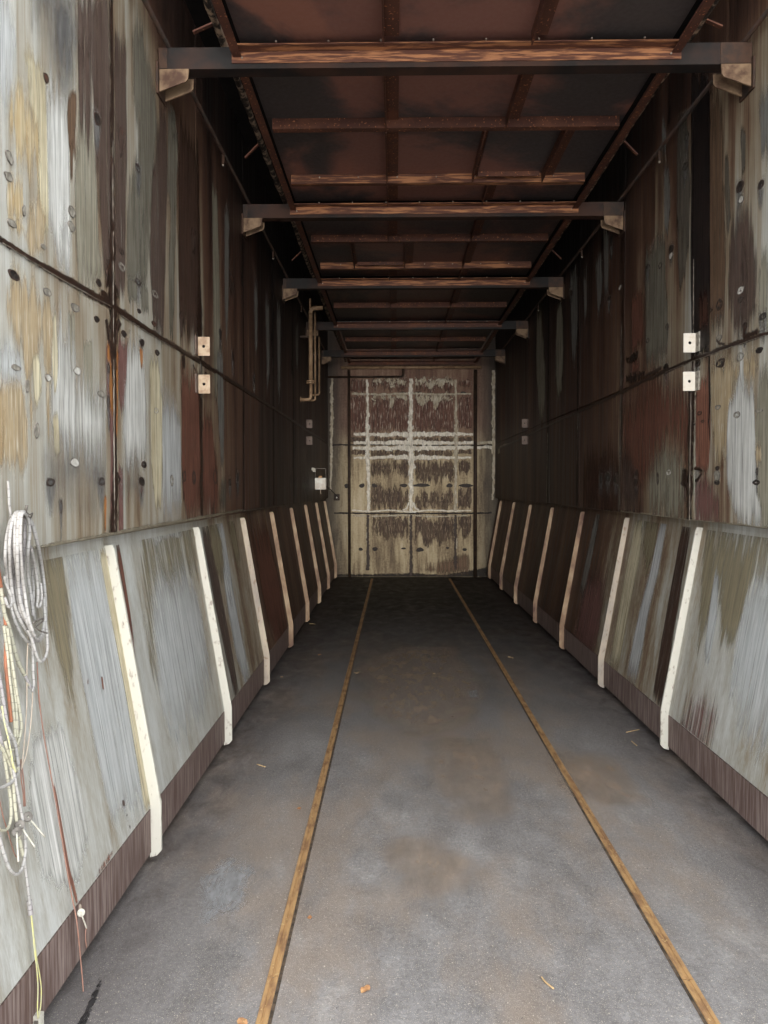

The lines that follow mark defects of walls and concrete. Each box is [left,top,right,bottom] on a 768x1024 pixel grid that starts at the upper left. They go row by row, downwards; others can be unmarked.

corrosion [178,117,199,339]
corrosion [709,89,726,332]
corrosion [104,340,143,531]
leakage [351,370,509,548]